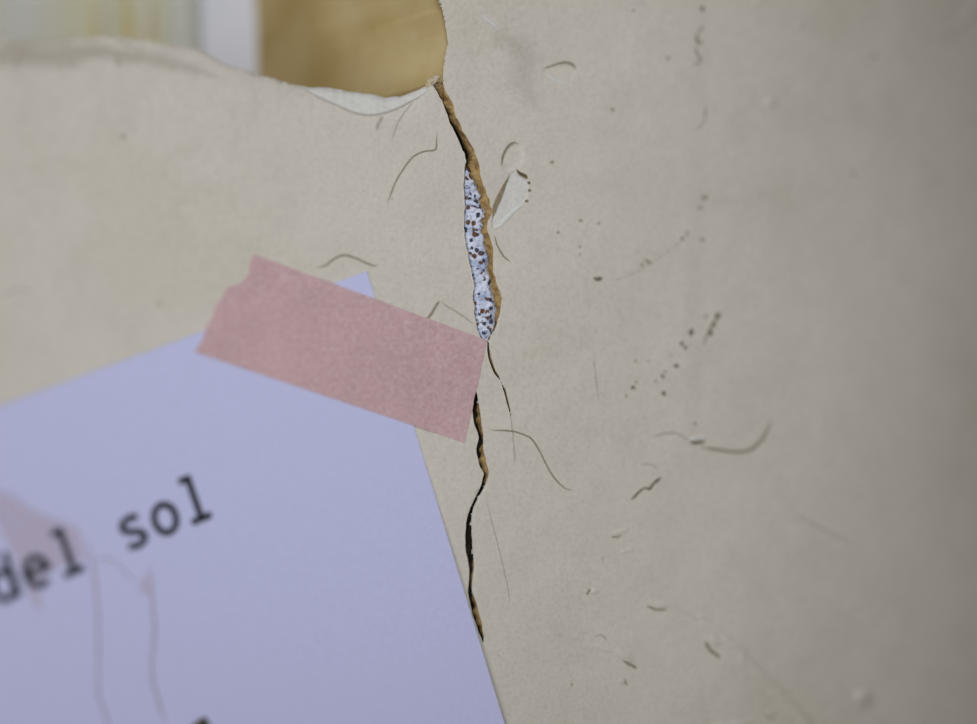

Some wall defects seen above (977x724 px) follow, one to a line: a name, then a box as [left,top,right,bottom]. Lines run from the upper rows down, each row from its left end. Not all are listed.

crack [389,82,566,643]
flaking render [492,142,531,261]